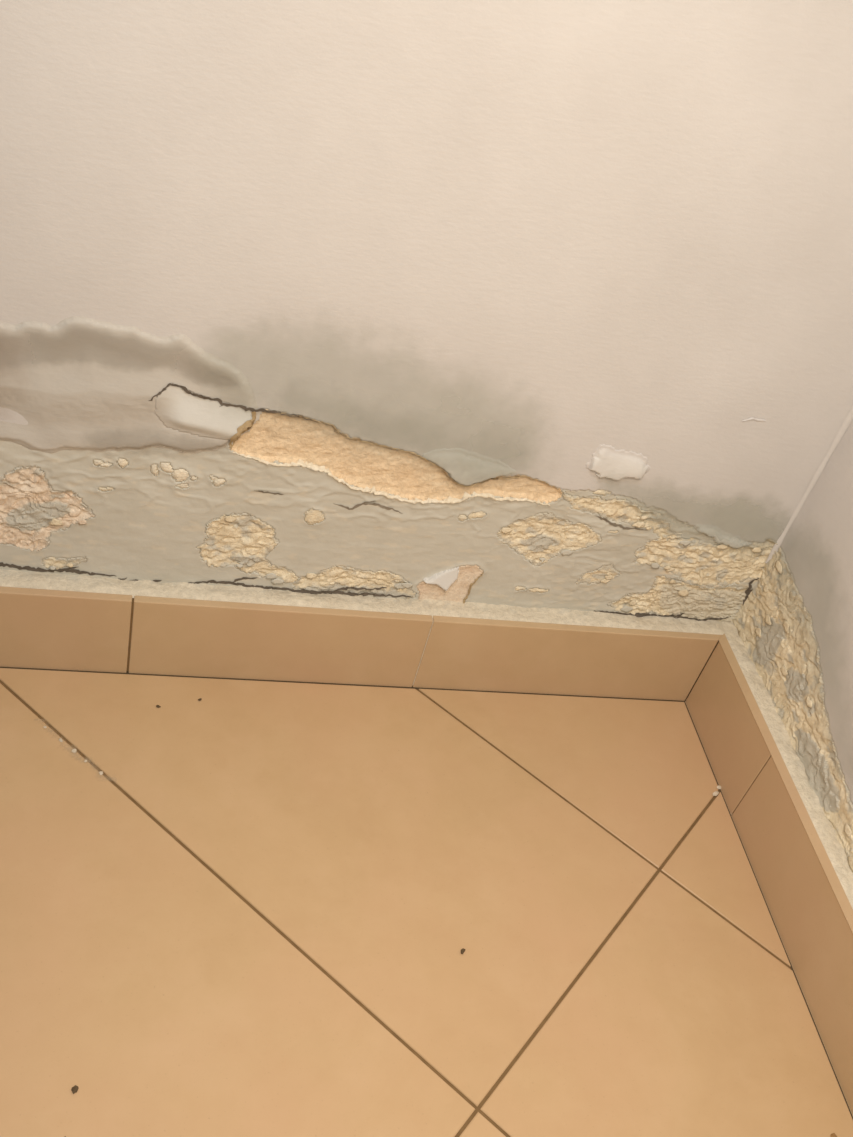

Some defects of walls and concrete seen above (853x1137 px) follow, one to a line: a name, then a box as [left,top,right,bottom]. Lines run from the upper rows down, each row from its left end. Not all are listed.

peeling [0,385,853,872]